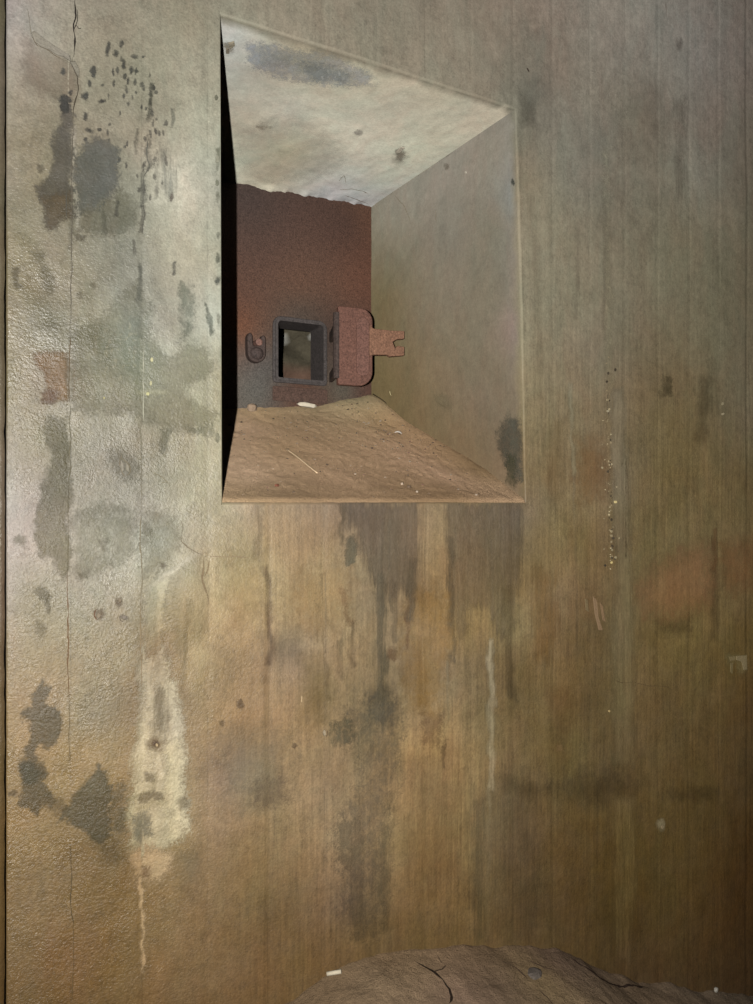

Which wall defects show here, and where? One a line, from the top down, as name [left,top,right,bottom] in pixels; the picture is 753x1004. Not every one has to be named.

crack [72,2,80,110]
leakage [35,66,134,240]
leakage [106,41,168,140]
leakage [247,42,370,86]
leakage [495,419,524,484]
leakage [8,416,198,973]
leakage [329,503,418,938]
leakage [448,503,520,806]